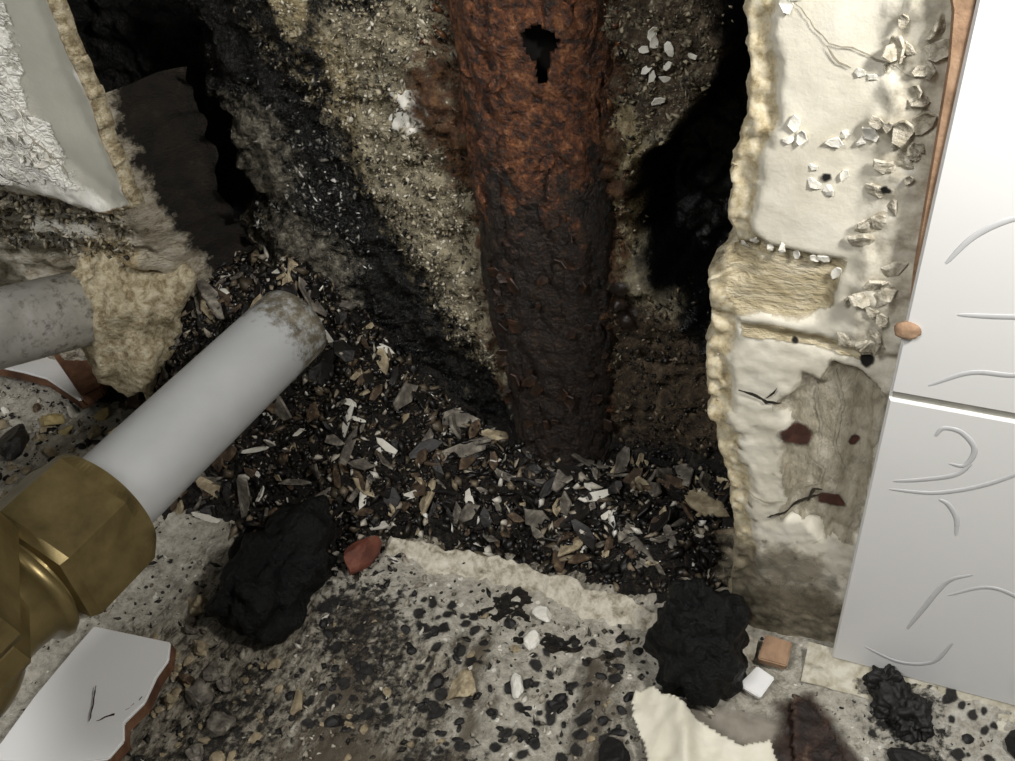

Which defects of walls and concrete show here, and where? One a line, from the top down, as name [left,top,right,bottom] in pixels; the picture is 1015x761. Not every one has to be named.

leakage [185,0,508,418]
rust [395,0,486,251]
hole [520,24,559,83]
rust [596,3,642,353]
peeling [638,27,674,83]
crack [792,1,913,77]
flaking render [825,12,949,247]
rust [470,272,537,391]
flaking render [723,237,908,543]